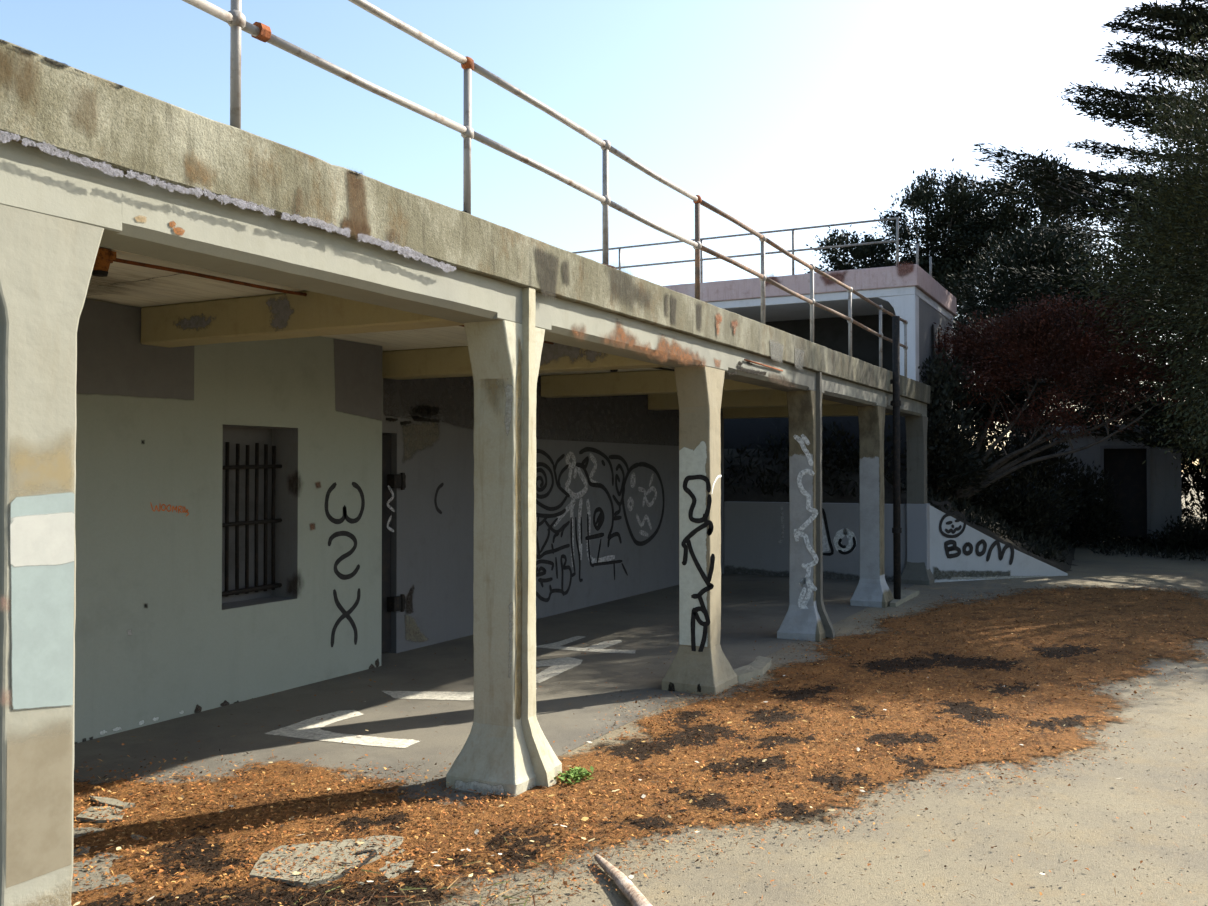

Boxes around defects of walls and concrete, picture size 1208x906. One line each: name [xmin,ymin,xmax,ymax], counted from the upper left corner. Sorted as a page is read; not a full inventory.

peeling [0,130,456,273]
water stain [535,248,569,298]
peeling [540,342,606,365]
rust [606,322,720,367]